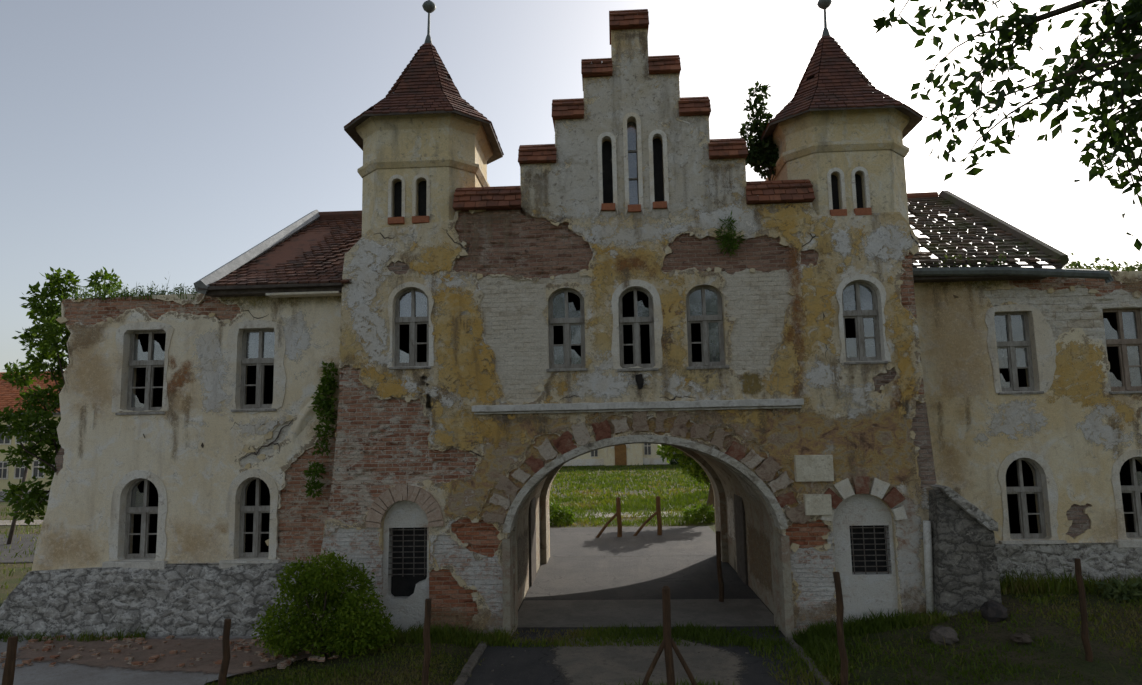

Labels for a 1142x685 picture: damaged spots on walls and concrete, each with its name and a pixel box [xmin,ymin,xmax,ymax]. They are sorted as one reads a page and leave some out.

spalling [55,293,244,330]
peeling [235,52,936,637]
spalling [977,268,1142,458]
spalling [1064,503,1095,538]